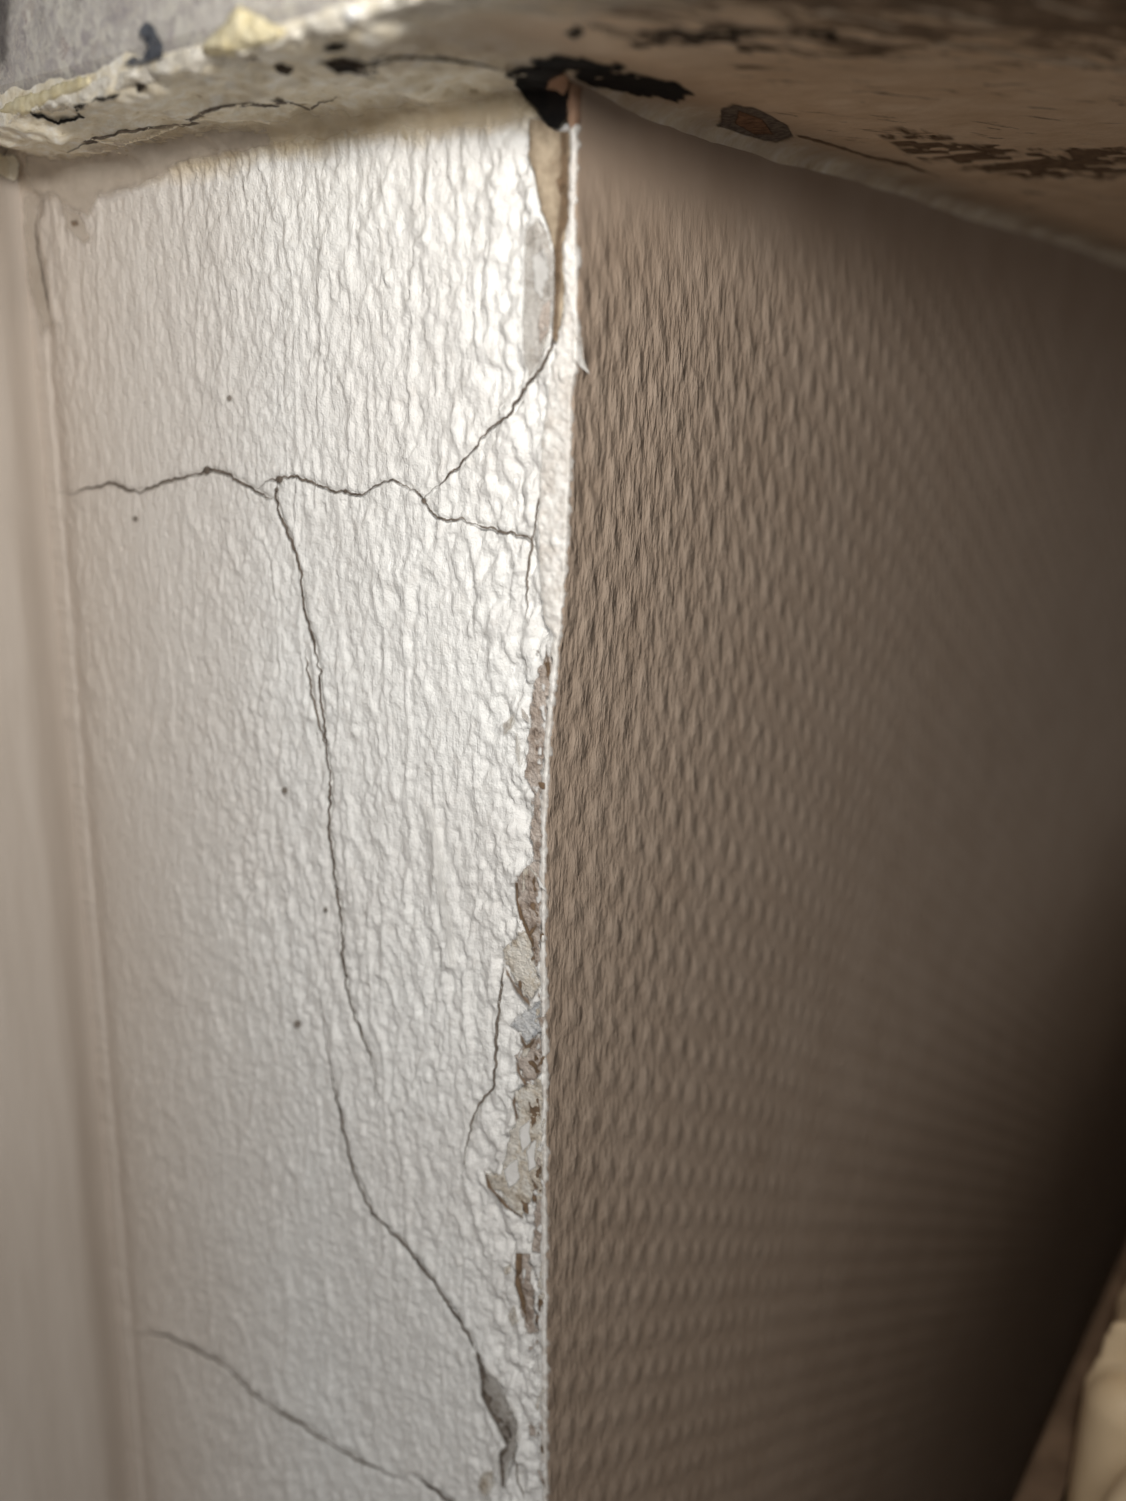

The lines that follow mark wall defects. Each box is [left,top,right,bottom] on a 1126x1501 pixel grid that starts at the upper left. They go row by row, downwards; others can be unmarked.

peeling [547,74,569,95]
crack [74,312,564,1370]
spalling [478,640,552,1497]
crack [148,1332,452,1501]
crack [512,1451,524,1496]